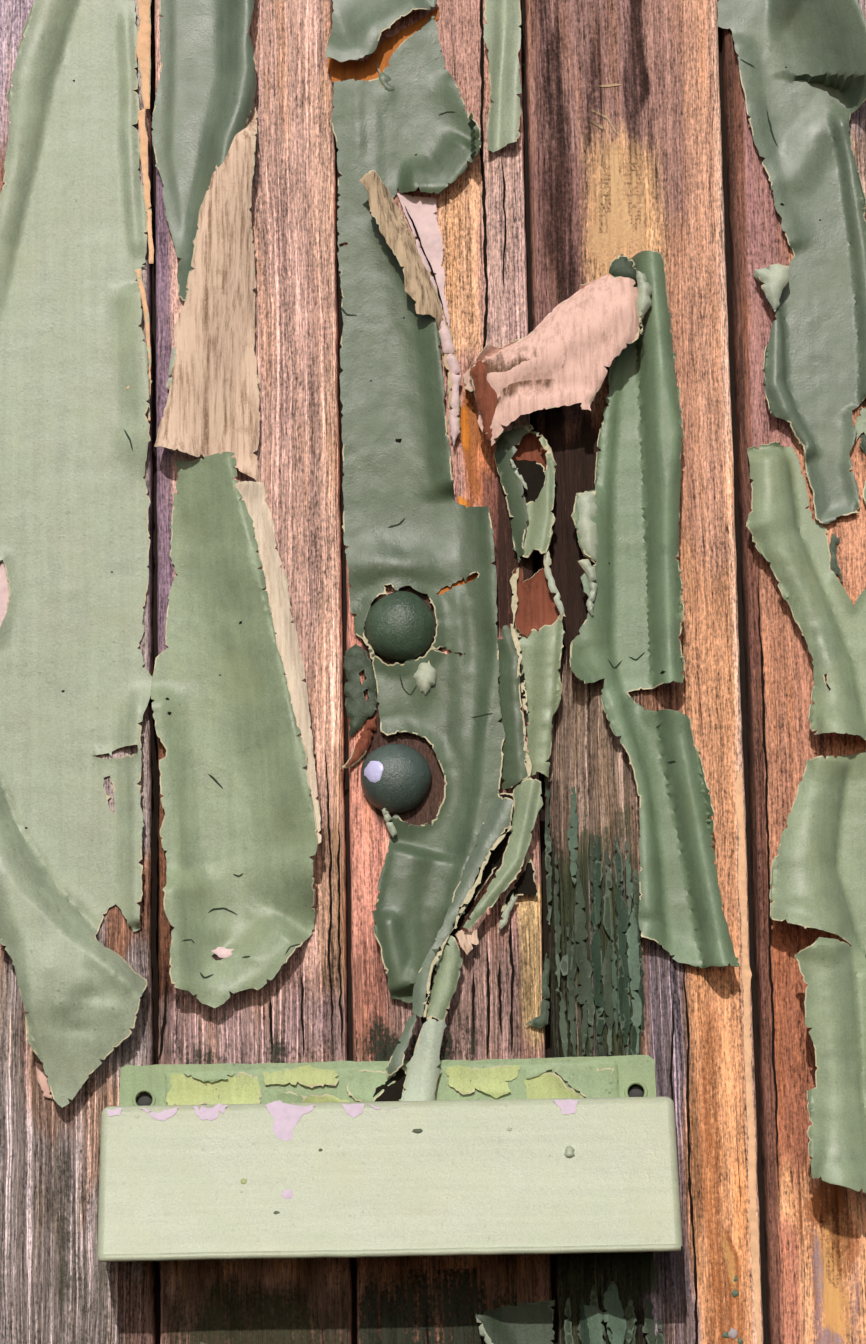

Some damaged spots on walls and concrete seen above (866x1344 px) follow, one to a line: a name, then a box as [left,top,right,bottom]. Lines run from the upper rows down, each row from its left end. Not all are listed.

peeling [0,0,322,1108]
peeling [141,0,740,1141]
peeling [717,0,866,1193]
water stain [172,1268,529,1344]
peeling [476,1281,665,1344]